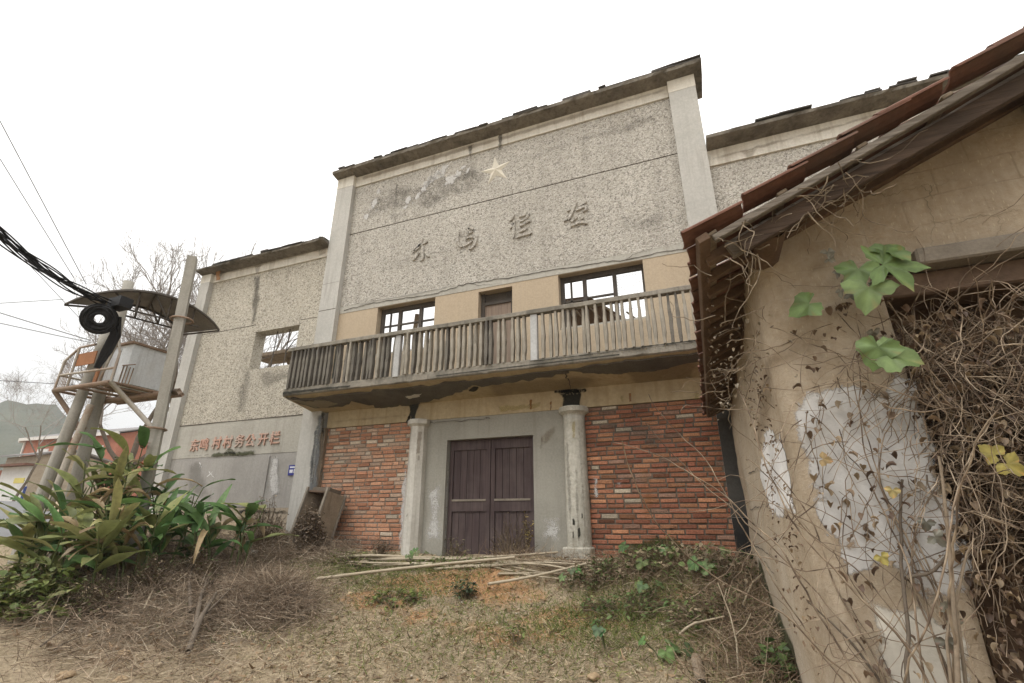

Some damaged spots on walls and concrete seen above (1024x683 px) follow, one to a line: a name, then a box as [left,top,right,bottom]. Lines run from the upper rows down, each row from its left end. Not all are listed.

flaking render [286,352,700,408]
peeling [760,429,796,519]
peeling [795,374,972,683]